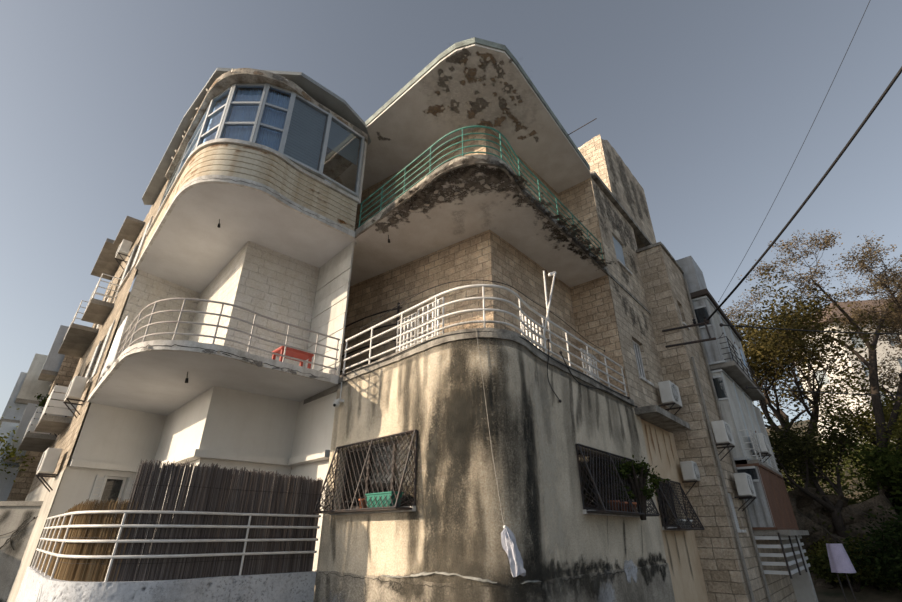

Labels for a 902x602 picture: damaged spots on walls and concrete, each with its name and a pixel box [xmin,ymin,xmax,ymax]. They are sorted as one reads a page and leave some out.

peeling [424,48,538,142]
spalling [365,208,390,234]
leakage [380,152,648,283]
leakage [377,323,620,602]
leakage [638,534,692,585]